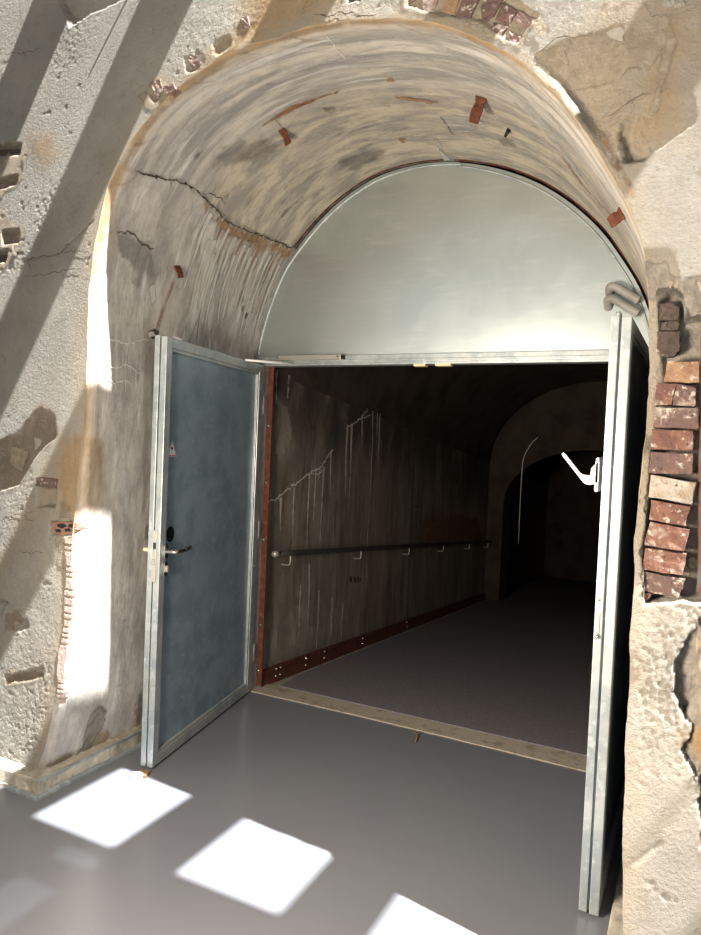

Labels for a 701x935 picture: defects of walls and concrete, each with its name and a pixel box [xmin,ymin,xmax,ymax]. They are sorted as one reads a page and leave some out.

spalling [402,0,550,49]
spalling [0,209,25,273]
spalling [0,140,29,197]
crack [137,171,295,250]
corrosion [216,216,291,301]
spalling [0,402,57,492]
spalling [645,262,701,598]
spalling [667,621,701,768]